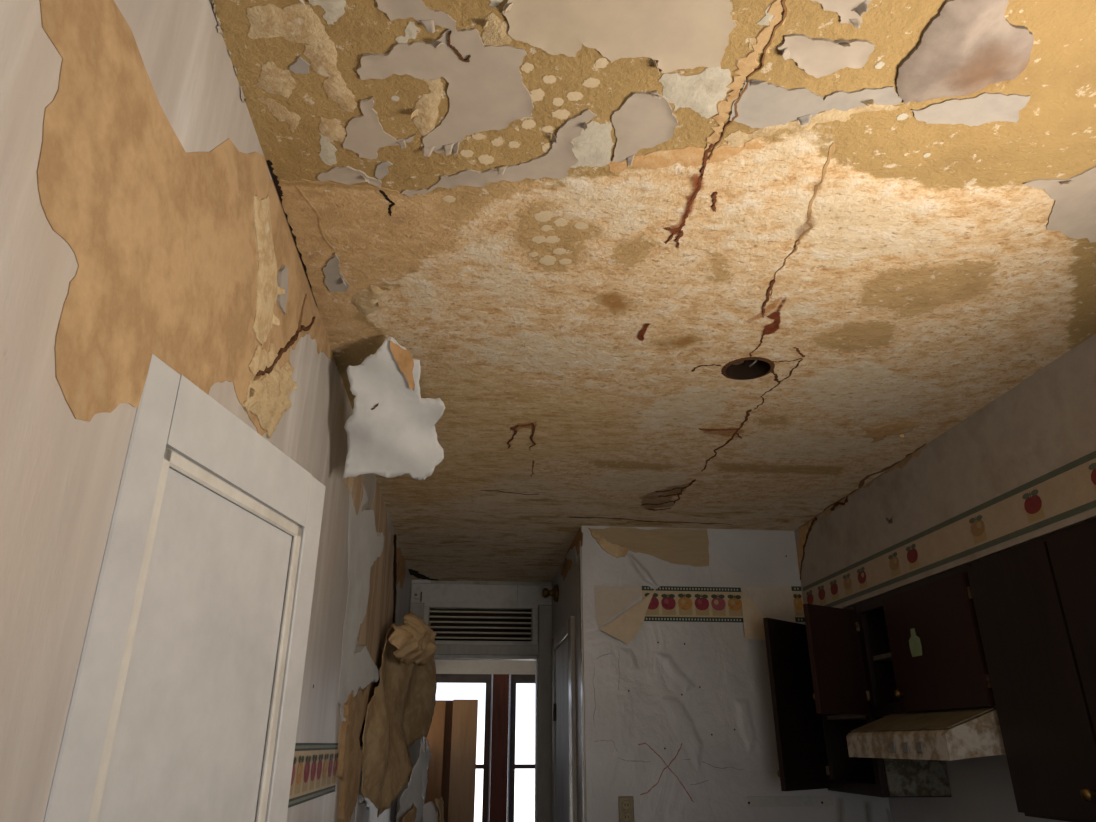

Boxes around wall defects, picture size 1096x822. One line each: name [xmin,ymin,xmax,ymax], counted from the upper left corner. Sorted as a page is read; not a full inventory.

peeling [228,0,1030,197]
crack [704,0,787,160]
flaking render [37,0,337,438]
crack [256,160,401,376]
flaking render [323,253,385,317]
crack [770,143,835,297]
peeling [1023,166,1096,242]
crack [749,334,805,410]
flaking render [342,474,406,710]